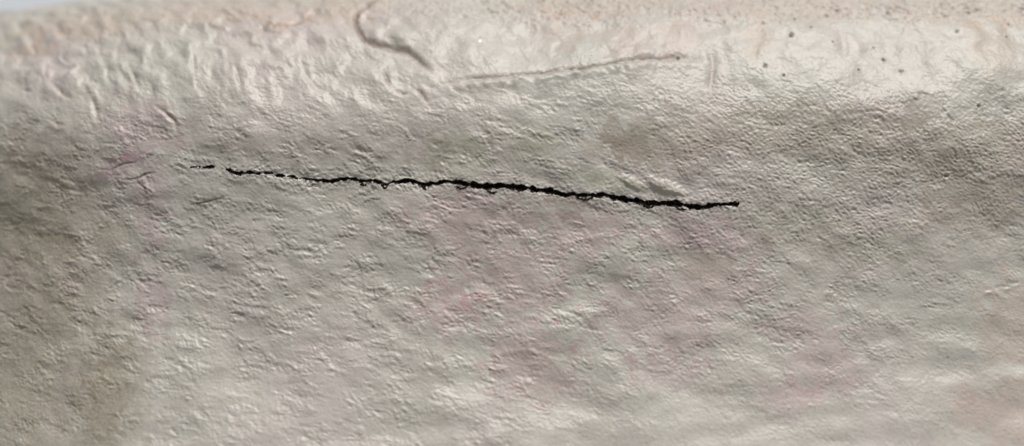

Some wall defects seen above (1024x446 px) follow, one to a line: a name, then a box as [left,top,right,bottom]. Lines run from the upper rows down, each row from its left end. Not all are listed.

crack [190,165,739,210]